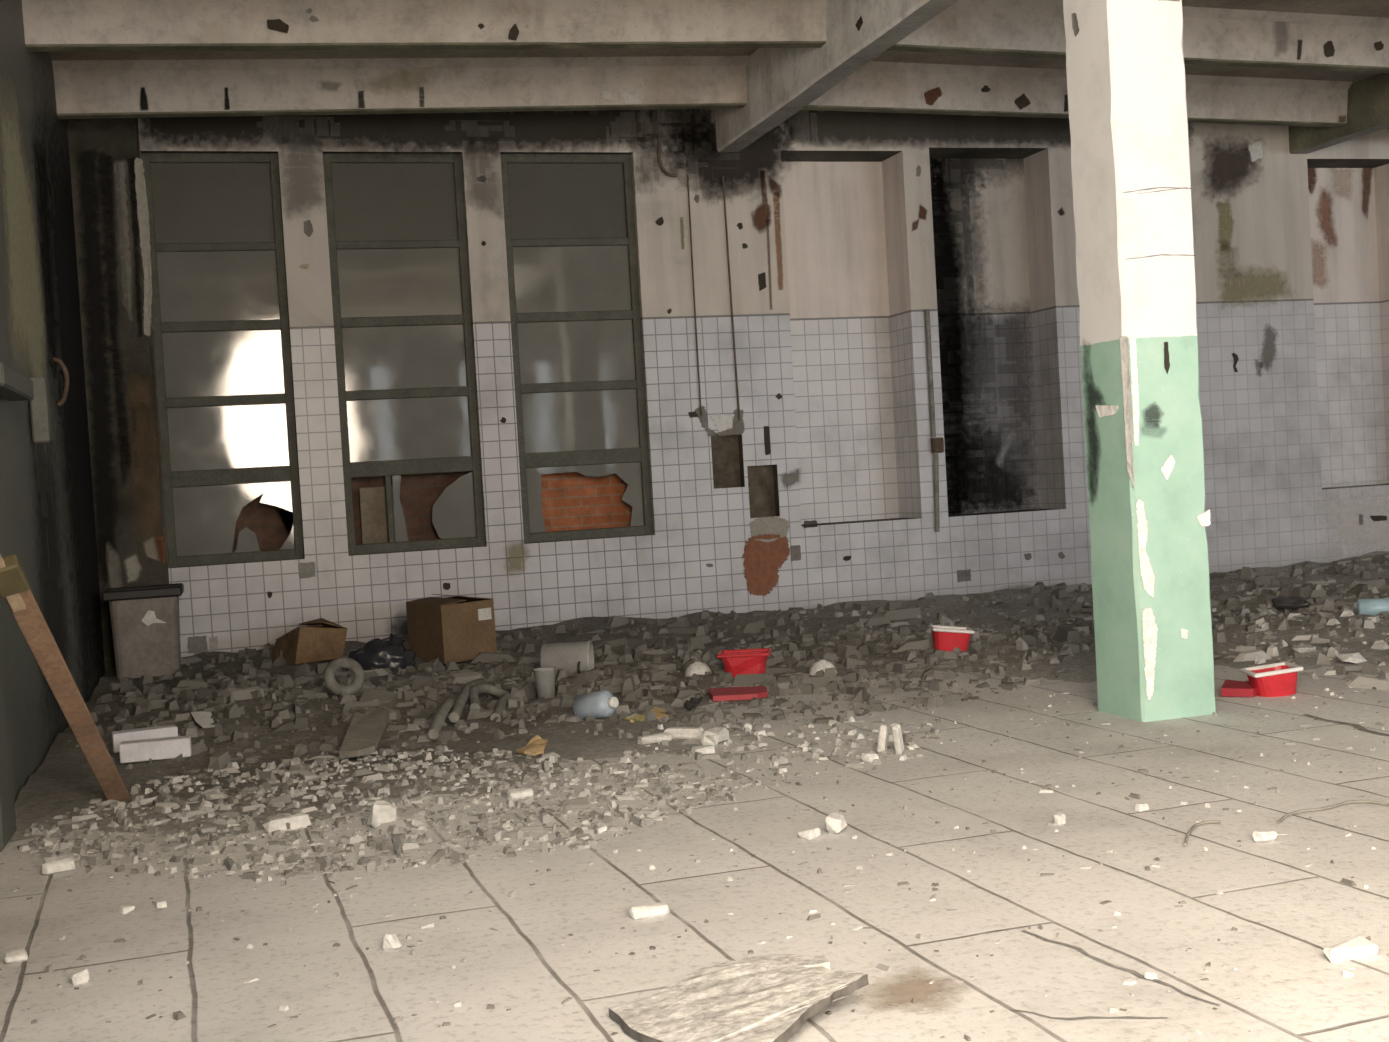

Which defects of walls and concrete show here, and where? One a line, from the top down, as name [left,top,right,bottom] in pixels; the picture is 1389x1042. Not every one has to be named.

corrosion [1307,168,1373,284]
spalling [742,516,817,596]
peeling [957,569,971,582]